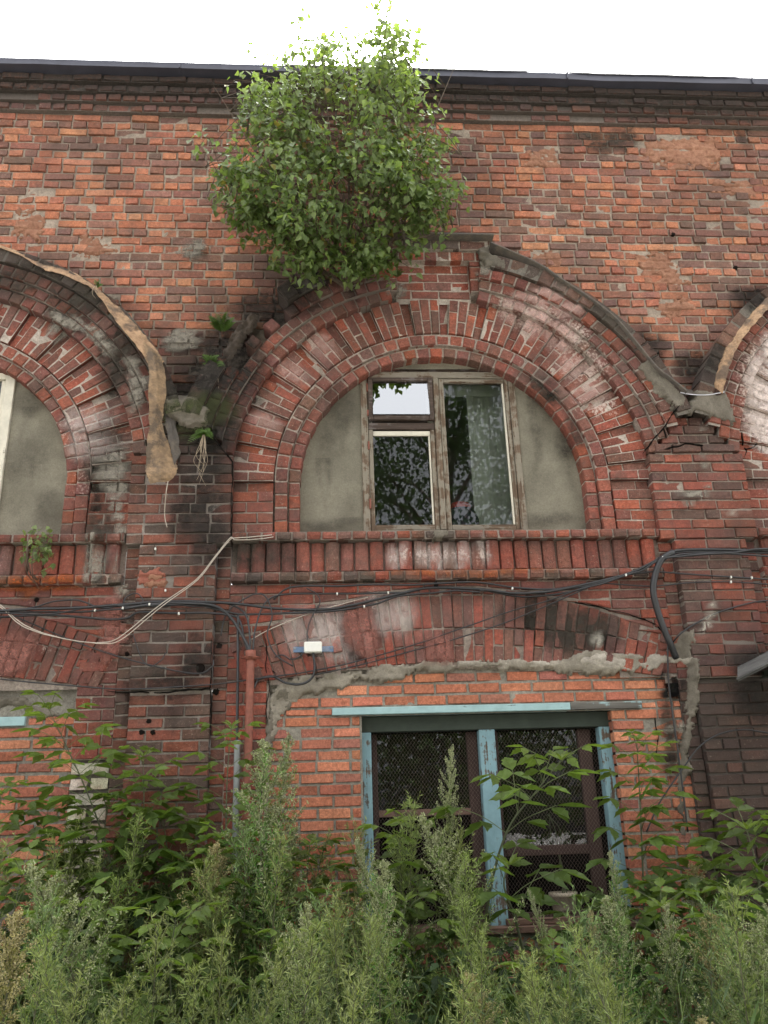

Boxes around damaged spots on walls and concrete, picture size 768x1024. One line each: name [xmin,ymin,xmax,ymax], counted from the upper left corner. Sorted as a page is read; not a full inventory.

crack [643,405,703,453]
crack [741,432,762,455]